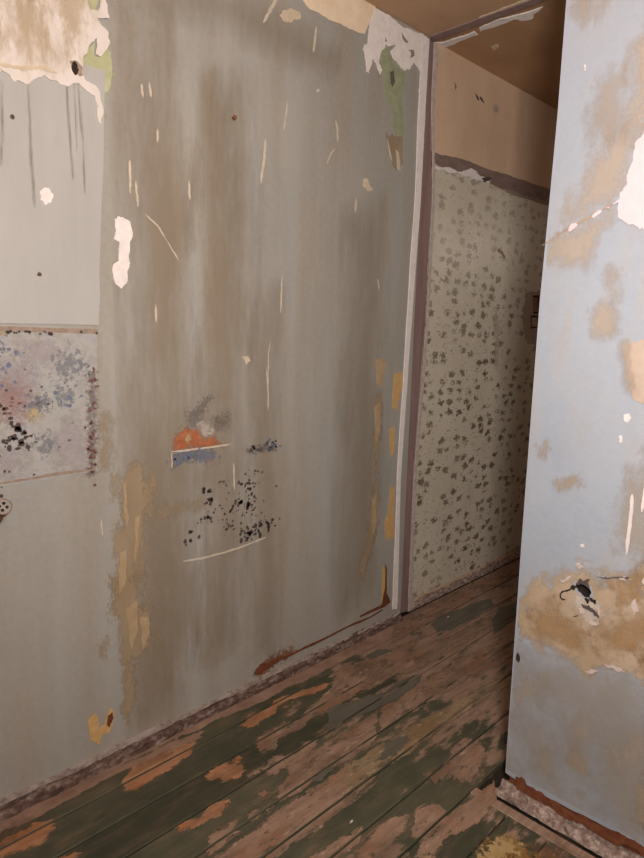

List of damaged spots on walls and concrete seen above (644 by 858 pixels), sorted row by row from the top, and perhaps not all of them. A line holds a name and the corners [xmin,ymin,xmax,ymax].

peeling [0,0,116,124]
peeling [280,0,543,137]
flaking render [617,133,644,231]
peeling [112,216,133,289]
peeling [624,339,644,404]
peeling [359,358,403,579]
peeling [87,461,187,744]
spalling [576,584,601,626]